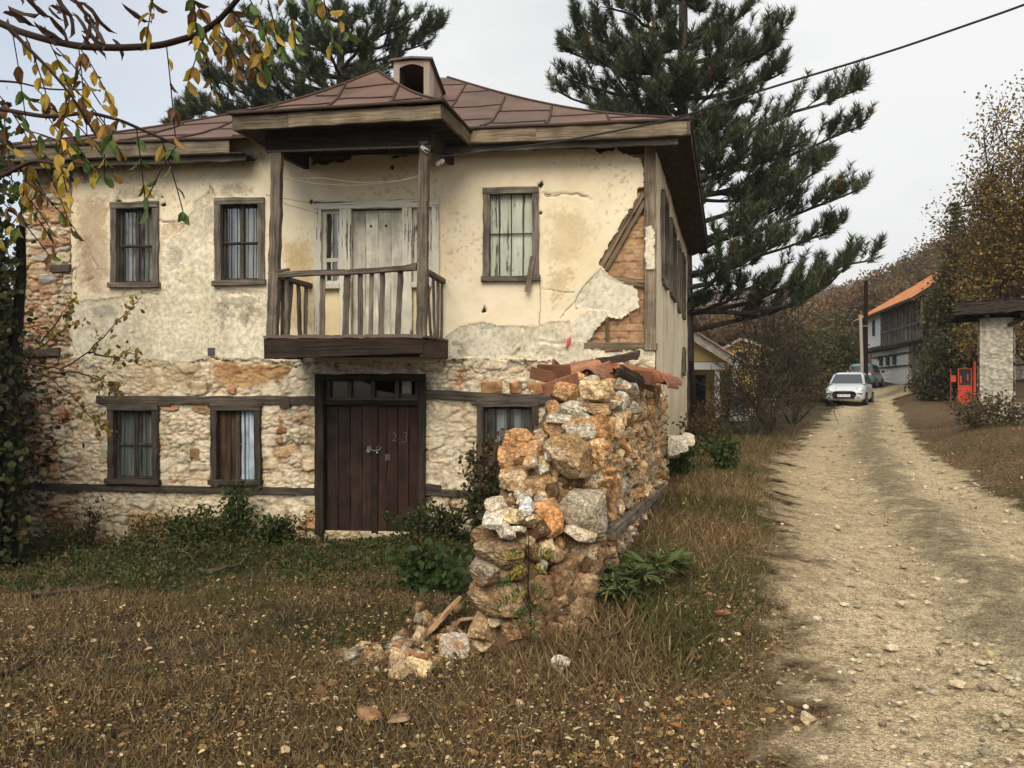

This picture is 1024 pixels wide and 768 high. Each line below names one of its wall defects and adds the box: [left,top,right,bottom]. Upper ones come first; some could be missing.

peeling [444,270,654,362]